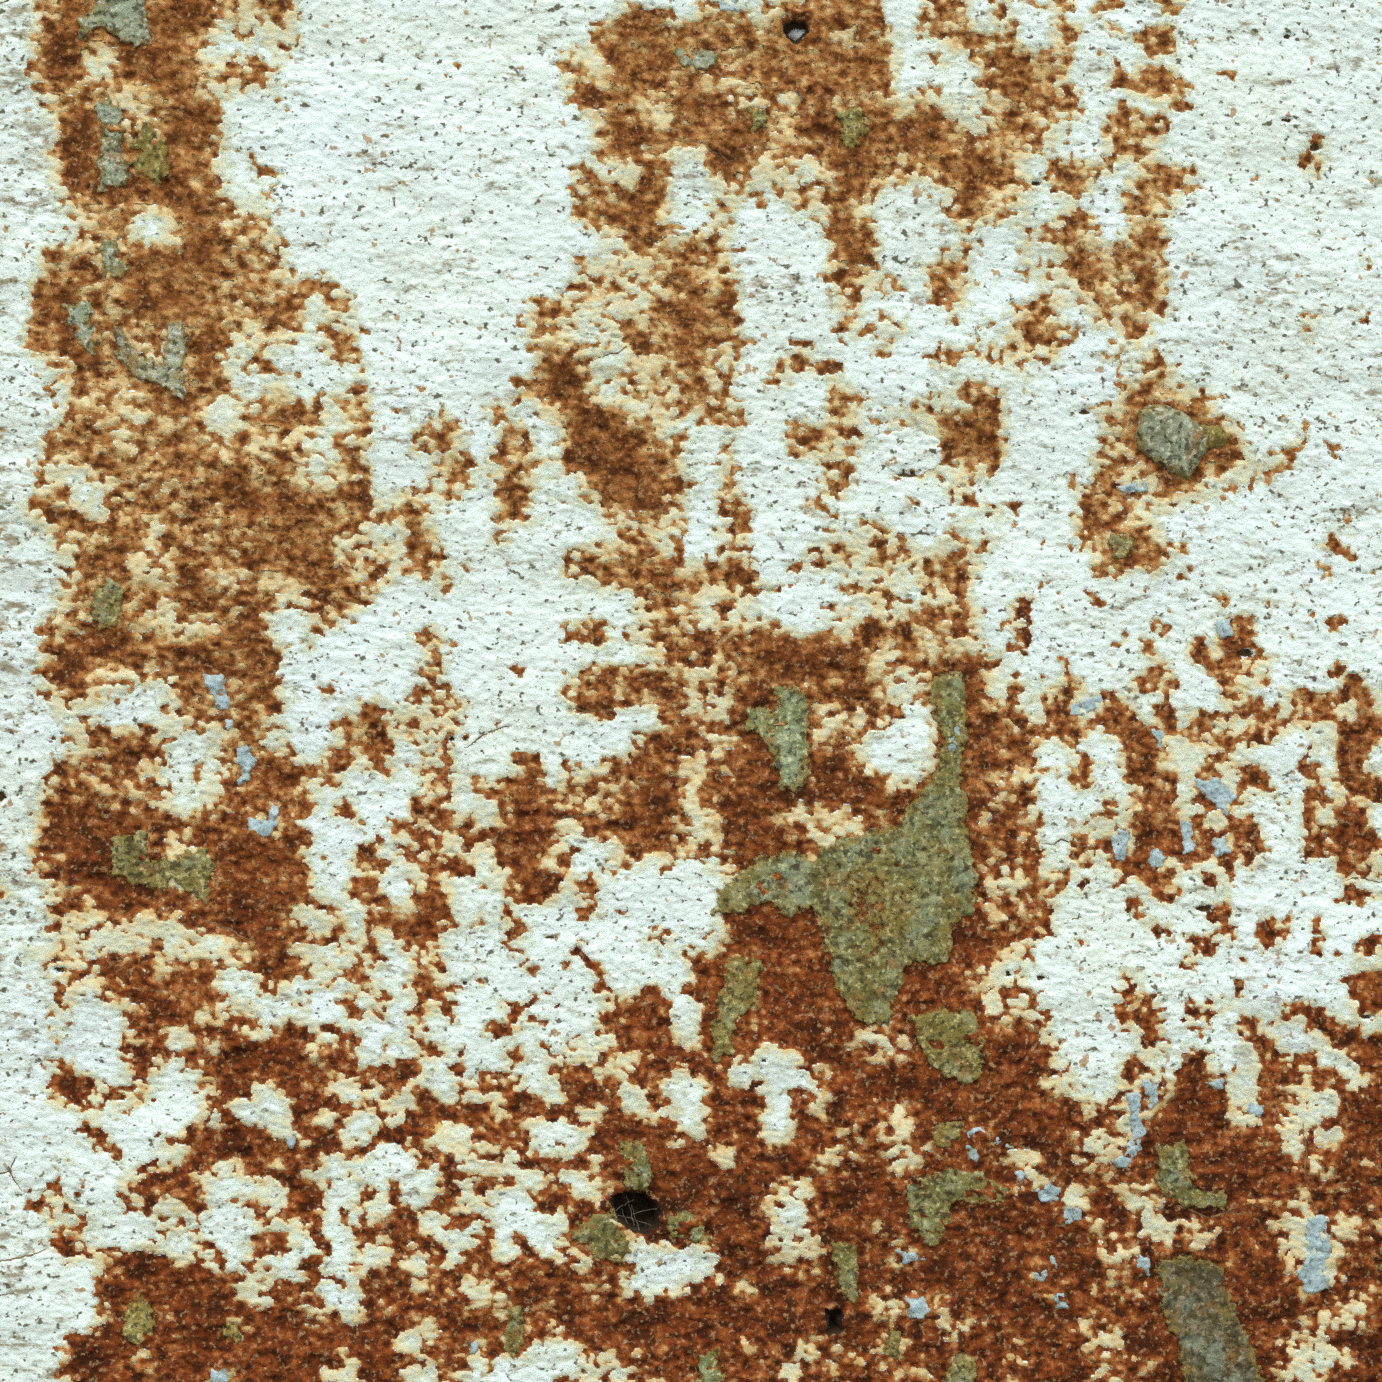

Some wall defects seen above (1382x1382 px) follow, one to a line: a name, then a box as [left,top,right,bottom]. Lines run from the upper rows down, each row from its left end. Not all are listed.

peeling [1109,0,1194,113]
peeling [923,238,984,326]
peeling [922,285,1080,372]
peeling [481,405,542,545]
peeling [764,338,870,533]
spalling [869,378,1022,529]
peeling [1000,596,1034,656]
peeling [396,625,470,726]
peeling [1151,902,1238,970]
peeling [1255,912,1382,958]
peeling [480,991,551,1040]
peeling [1112,970,1171,1058]